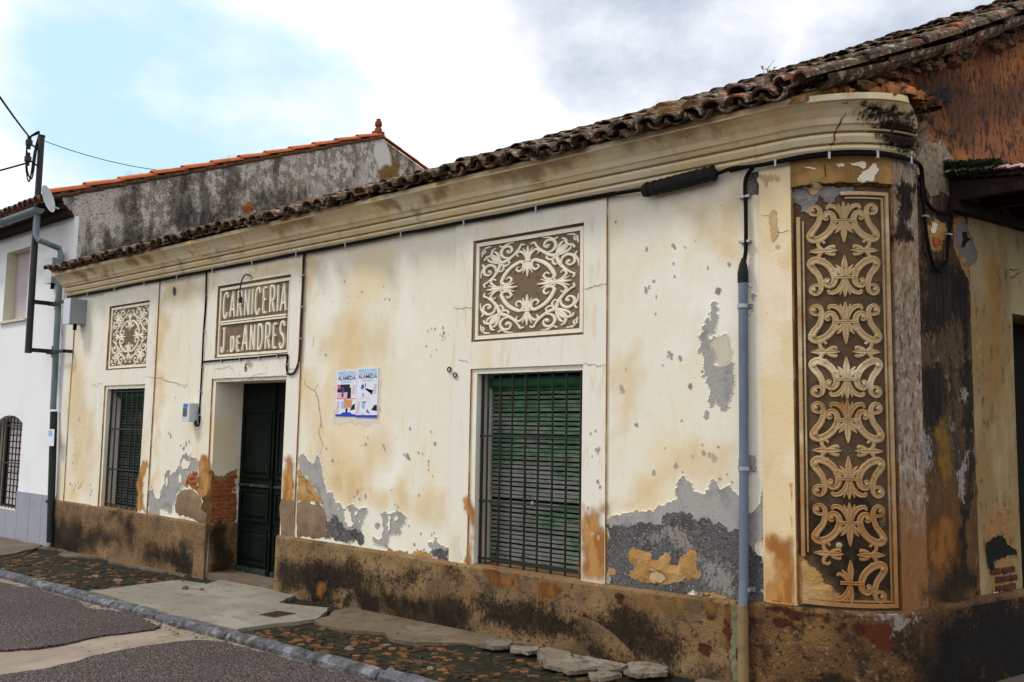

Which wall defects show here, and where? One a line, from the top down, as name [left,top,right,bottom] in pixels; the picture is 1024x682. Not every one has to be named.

damp [373,139,399,179]
spalling [793,161,879,213]
crack [793,113,892,189]
damp [857,81,952,155]
peeling [688,287,736,420]
damp [891,181,1024,682]
damp [49,461,148,553]
spalling [148,432,237,524]
peeling [297,448,449,560]
peeling [605,462,764,601]
spalling [986,505,1019,595]
damp [277,555,687,676]